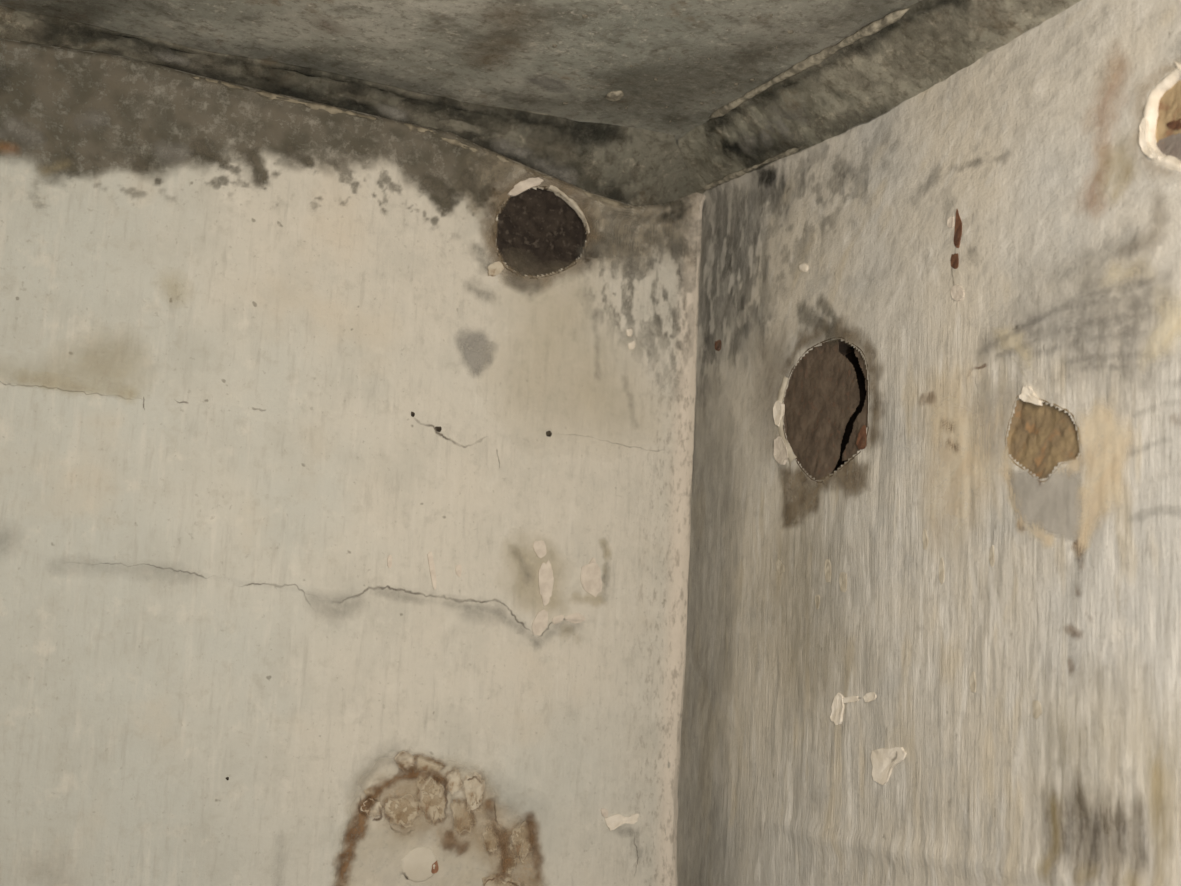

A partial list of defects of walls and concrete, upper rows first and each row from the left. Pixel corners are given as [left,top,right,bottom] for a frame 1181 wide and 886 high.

leakage [0,28,692,283]
peeling [1139,118,1160,159]
peeling [1019,385,1043,406]
peeling [532,540,586,636]
peeling [580,558,603,597]
peeling [830,692,877,725]
peeling [871,747,907,785]
spalling [337,751,541,886]